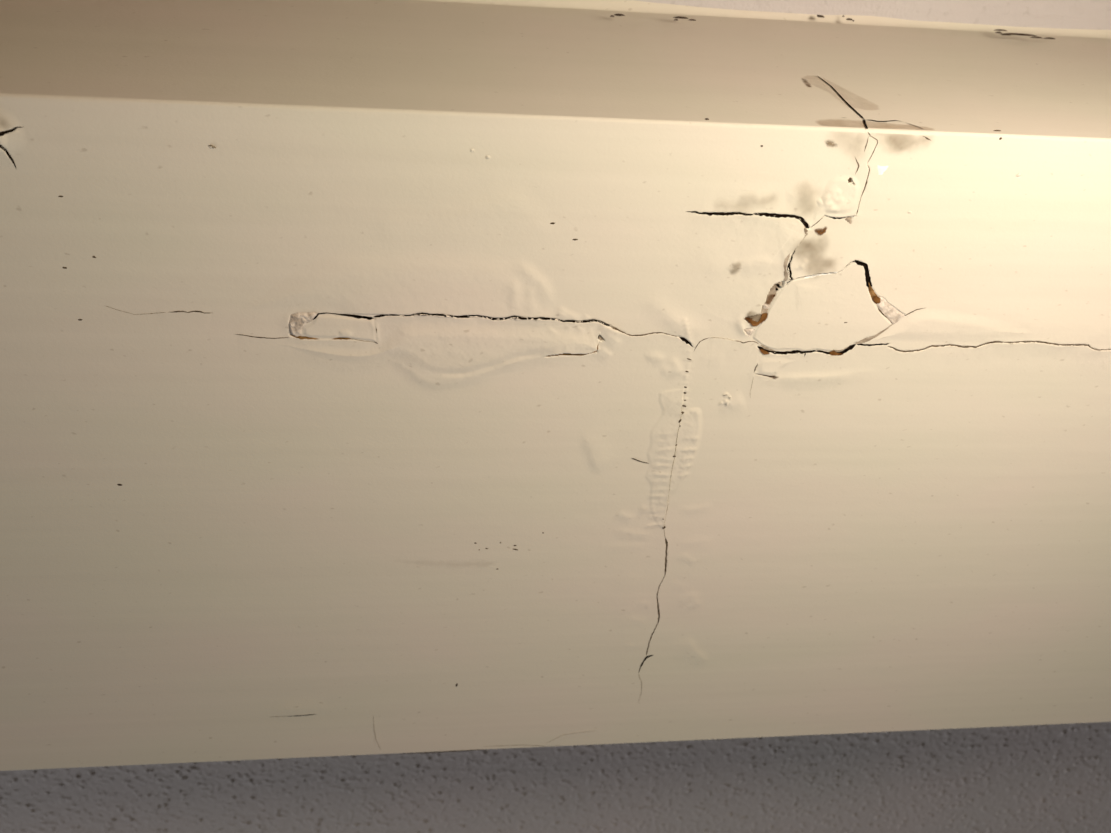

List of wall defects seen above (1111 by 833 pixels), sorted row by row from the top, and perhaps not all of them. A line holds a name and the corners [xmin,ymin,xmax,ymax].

crack [0,127,22,168]
peeling [754,212,947,351]
crack [358,76,1111,703]